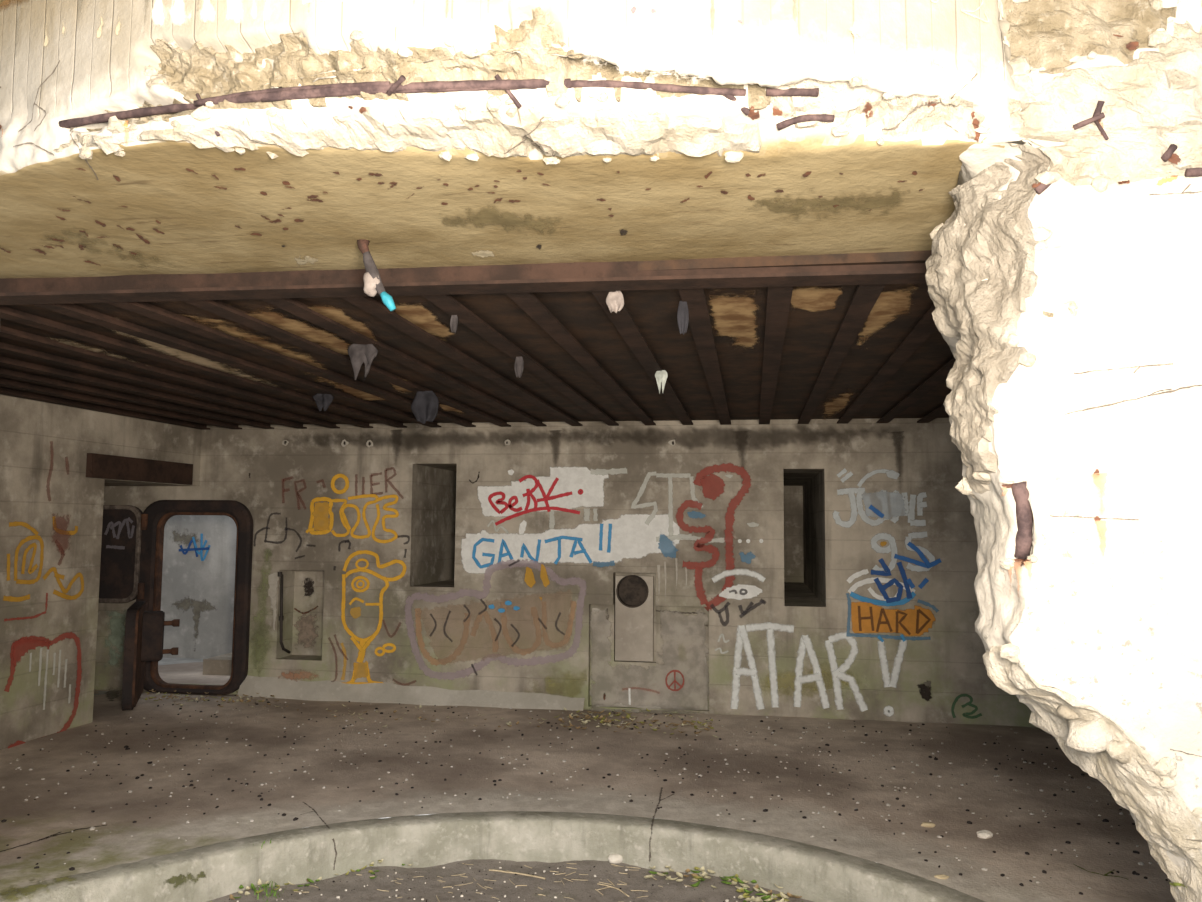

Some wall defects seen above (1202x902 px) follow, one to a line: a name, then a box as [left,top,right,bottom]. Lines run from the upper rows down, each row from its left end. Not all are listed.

spalling [54,7,991,165]
rust [748,106,782,120]
rust [1157,153,1181,185]
spalling [857,0,1202,500]
peeling [823,393,852,420]
spalling [1000,481,1038,570]
rust [1093,469,1107,555]